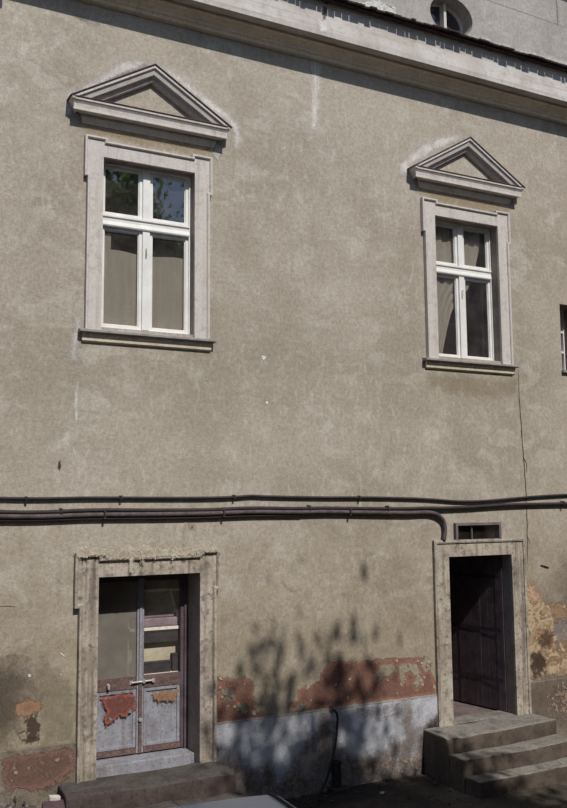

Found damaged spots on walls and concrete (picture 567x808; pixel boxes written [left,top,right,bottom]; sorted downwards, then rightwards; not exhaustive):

peeling [358,0,396,14]
damp [310,60,321,130]
peeling [217,674,271,722]
peeling [288,655,437,713]
peeling [527,581,567,720]
peeling [1,698,76,796]
damp [219,711,439,798]